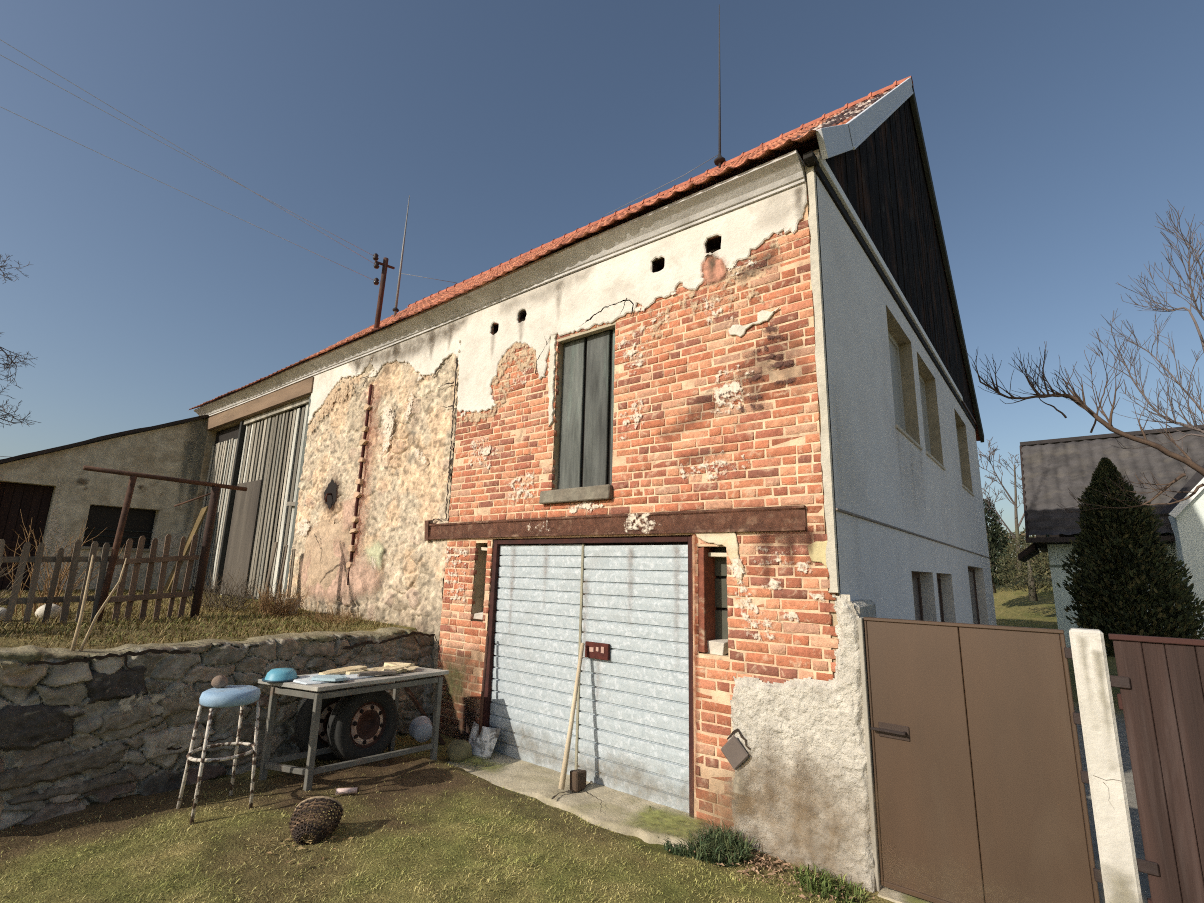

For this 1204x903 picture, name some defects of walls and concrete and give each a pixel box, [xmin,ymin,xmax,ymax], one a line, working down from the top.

flaking render [307,183,808,435]
peeling [295,517,310,536]
spalling [322,479,356,529]
rust [624,513,663,534]
peeling [730,558,744,584]
flaking render [728,593,875,893]